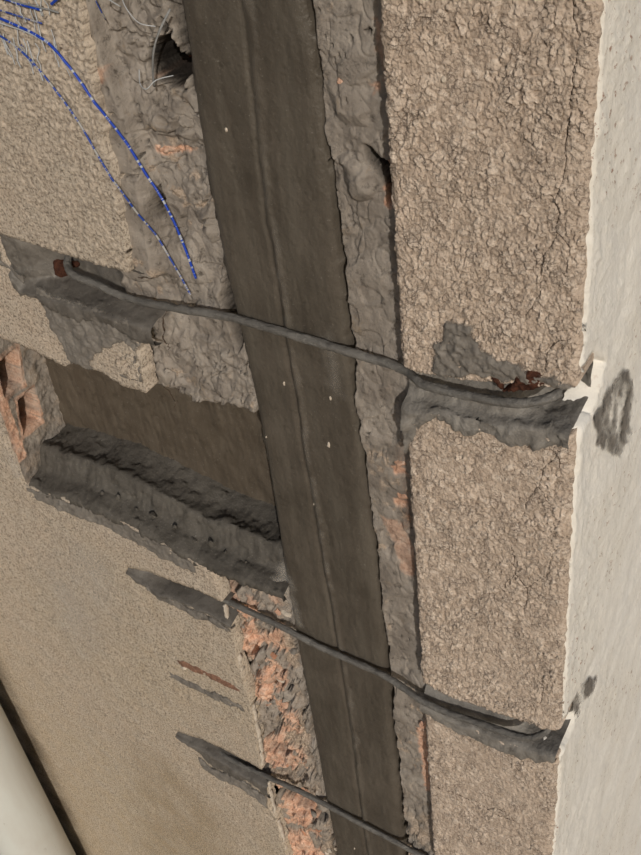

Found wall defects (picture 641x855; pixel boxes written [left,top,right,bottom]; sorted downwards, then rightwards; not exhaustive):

spalling [53,259,80,277]
spalling [492,370,544,392]
spalling [241,627,265,660]
spalling [256,664,278,702]
spalling [263,732,298,771]
spalling [419,721,430,782]
spalling [288,787,324,855]